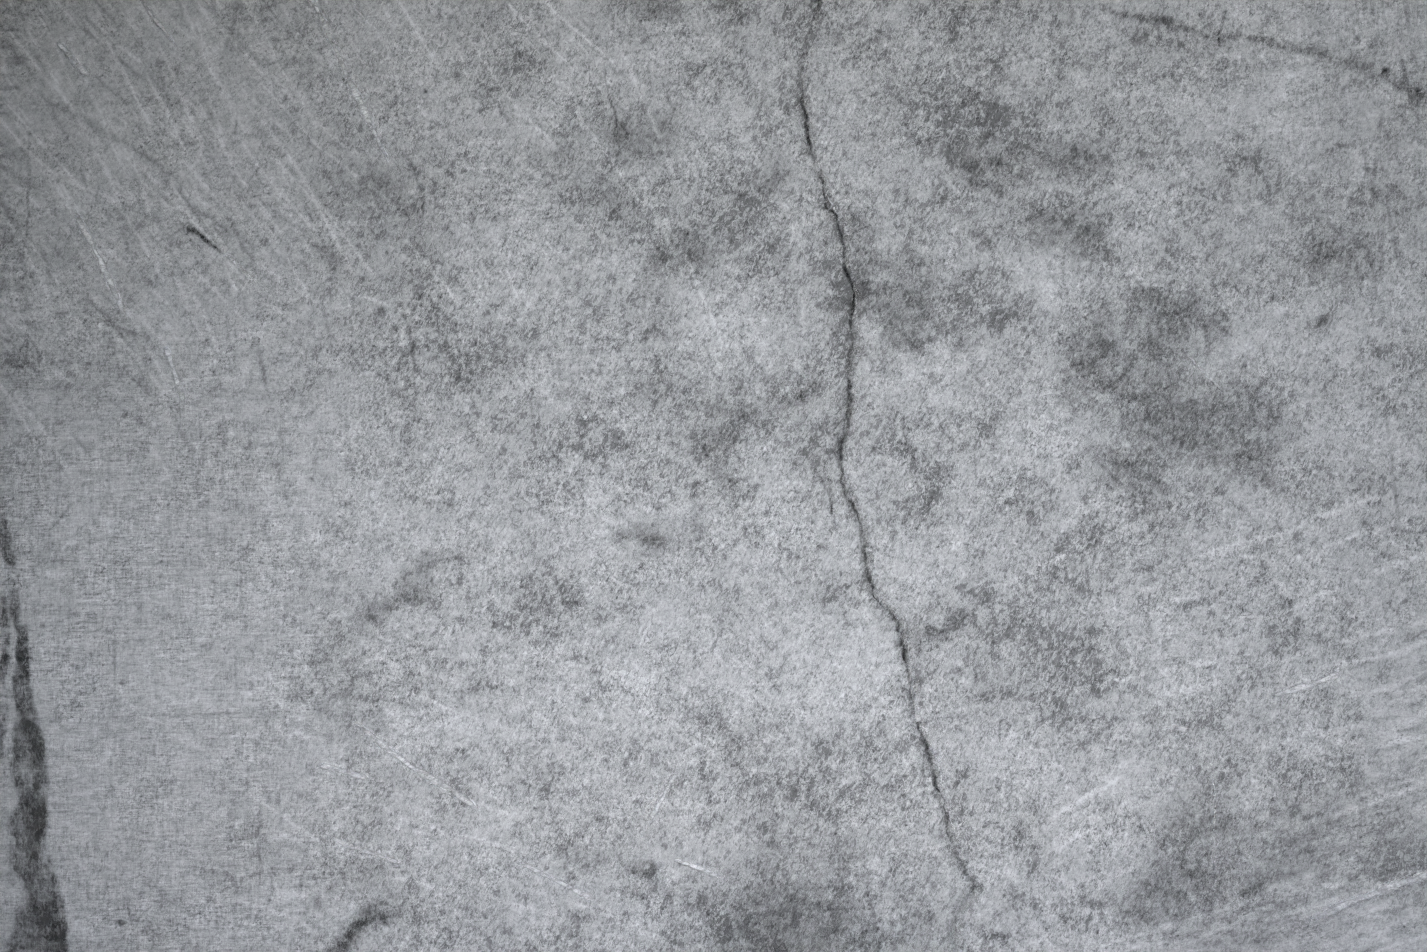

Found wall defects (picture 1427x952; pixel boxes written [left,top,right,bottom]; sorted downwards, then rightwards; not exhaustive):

crack [801,95,812,150]
crack [823,194,855,328]